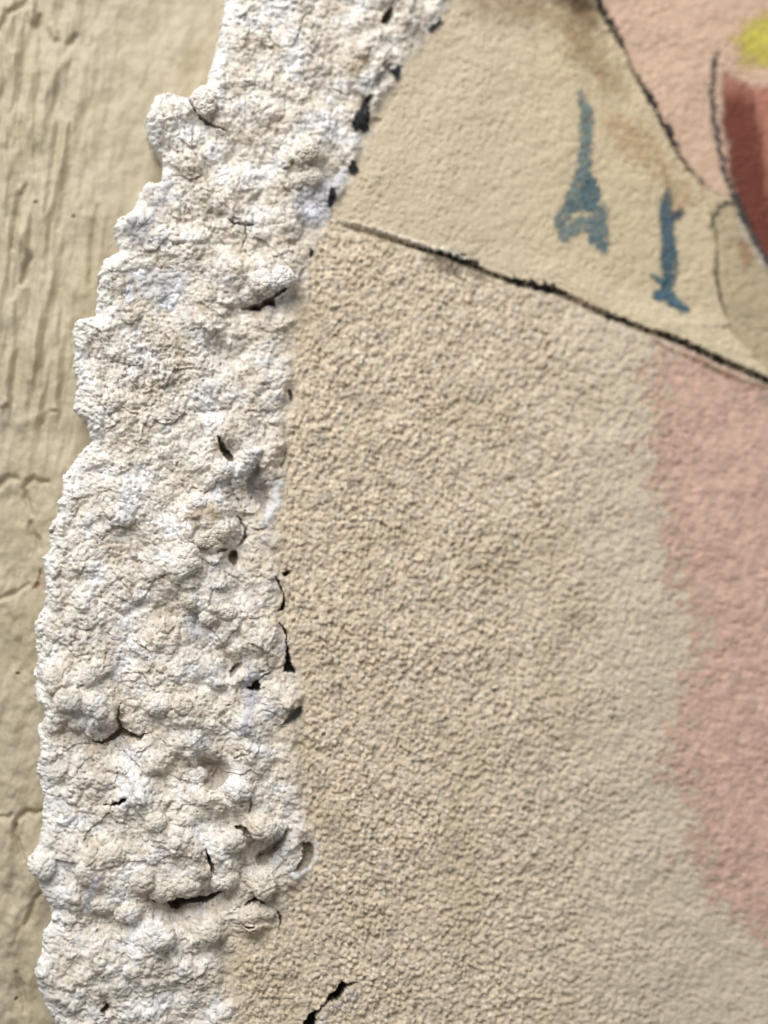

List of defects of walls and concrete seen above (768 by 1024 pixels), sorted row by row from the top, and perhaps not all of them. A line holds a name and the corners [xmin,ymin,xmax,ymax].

crack [188,97,224,131]
crack [230,220,254,247]
crack [275,571,296,673]
crack [303,981,355,1024]